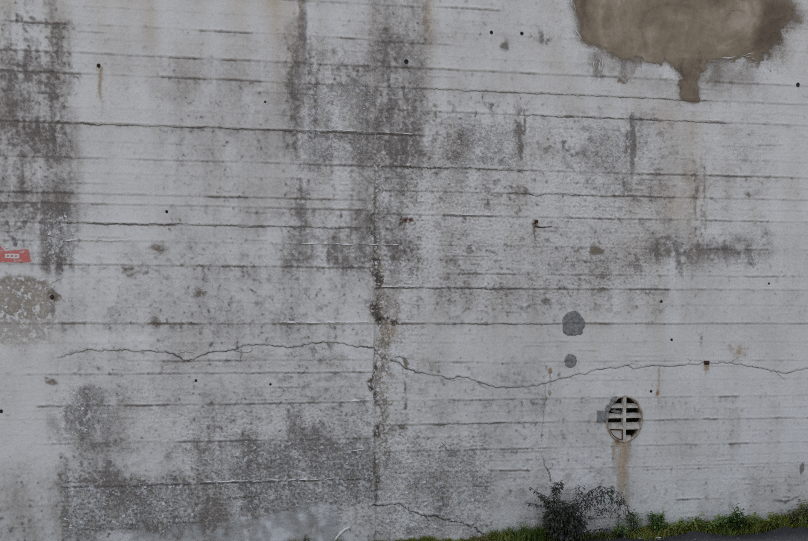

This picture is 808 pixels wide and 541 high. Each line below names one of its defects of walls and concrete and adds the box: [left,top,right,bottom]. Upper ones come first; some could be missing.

damp [516,119,526,155]
damp [626,116,636,169]
damp [649,236,749,264]
spalling [0,276,58,342]
crack [62,341,423,373]
damp [257,436,367,491]
crack [374,503,484,534]